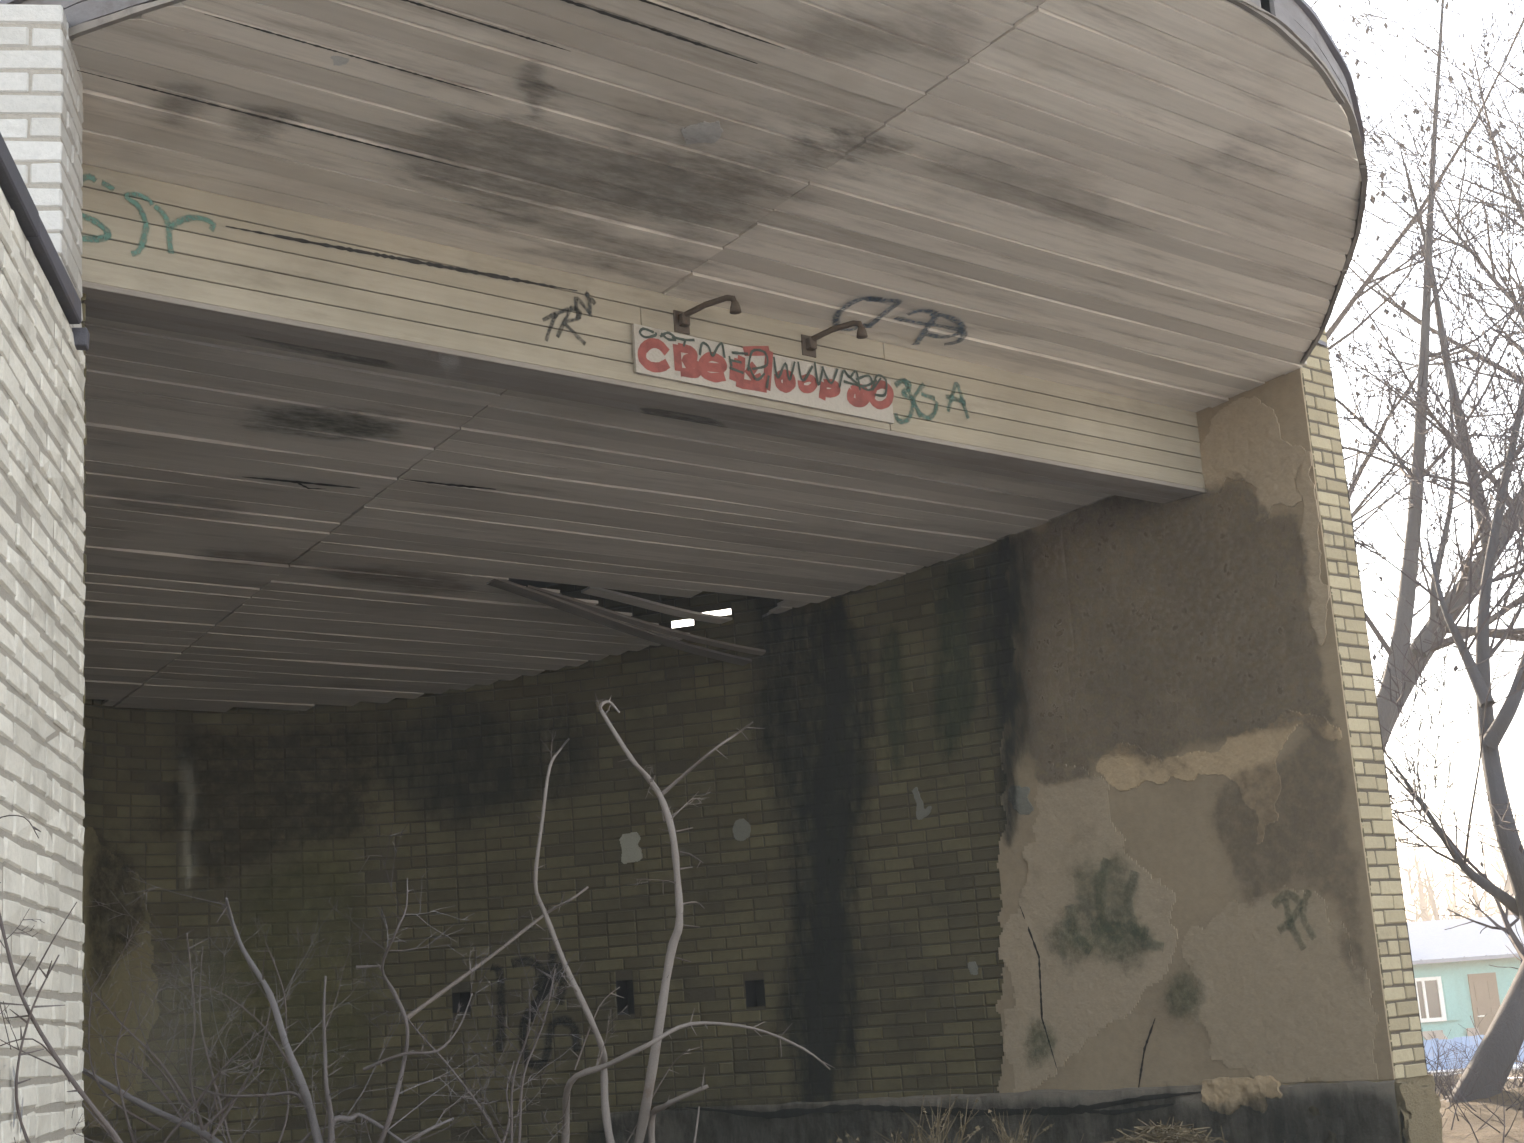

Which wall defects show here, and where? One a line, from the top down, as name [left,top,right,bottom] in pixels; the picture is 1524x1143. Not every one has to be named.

flaking render [1200,396,1330,646]
leakage [90,844,145,978]
flaking render [82,827,161,1128]
leakage [152,727,371,881]
crack [685,1019,1201,1119]
leakage [601,595,1398,1143]
crack [1020,907,1057,1068]
flaking render [998,712,1442,1143]